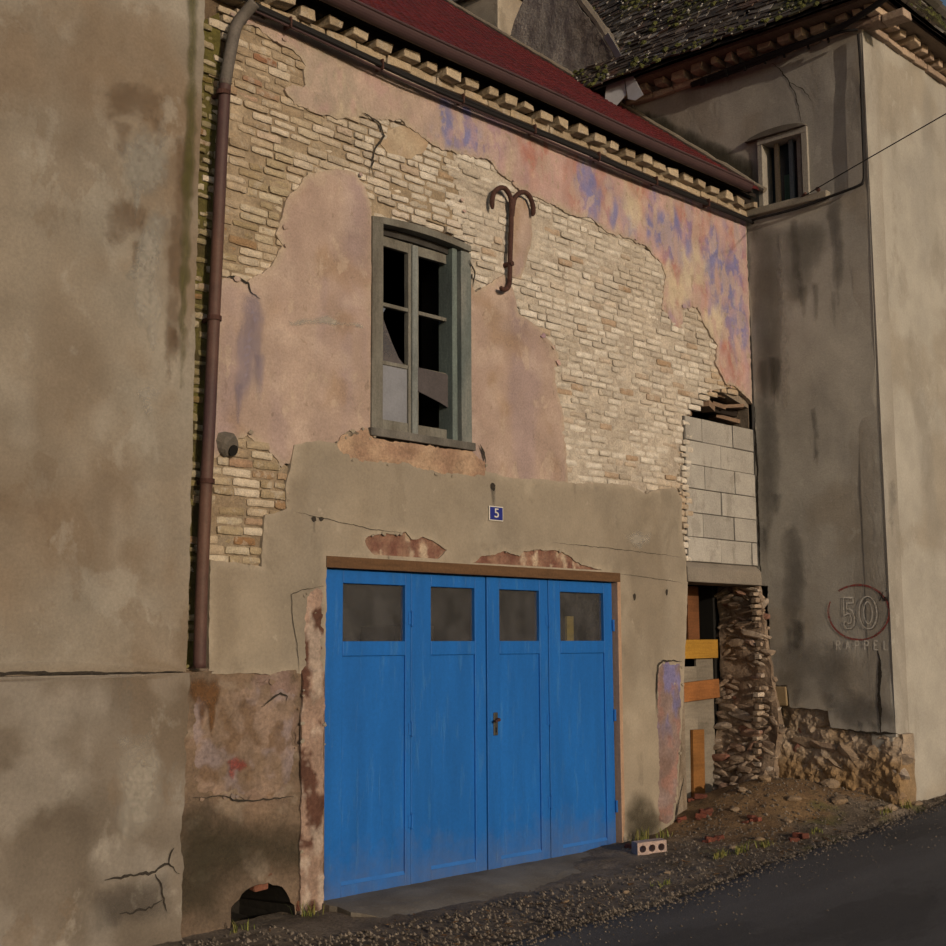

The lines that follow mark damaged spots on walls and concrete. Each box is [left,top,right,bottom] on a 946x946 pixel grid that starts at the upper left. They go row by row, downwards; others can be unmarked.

crack [771,63,811,120]
flaking render [186,5,237,669]
flaking render [222,25,744,562]
flaking render [209,430,290,569]
flaking render [473,549,597,570]
flaking render [192,588,327,928]
crack [849,648,898,735]
crack [106,848,180,915]